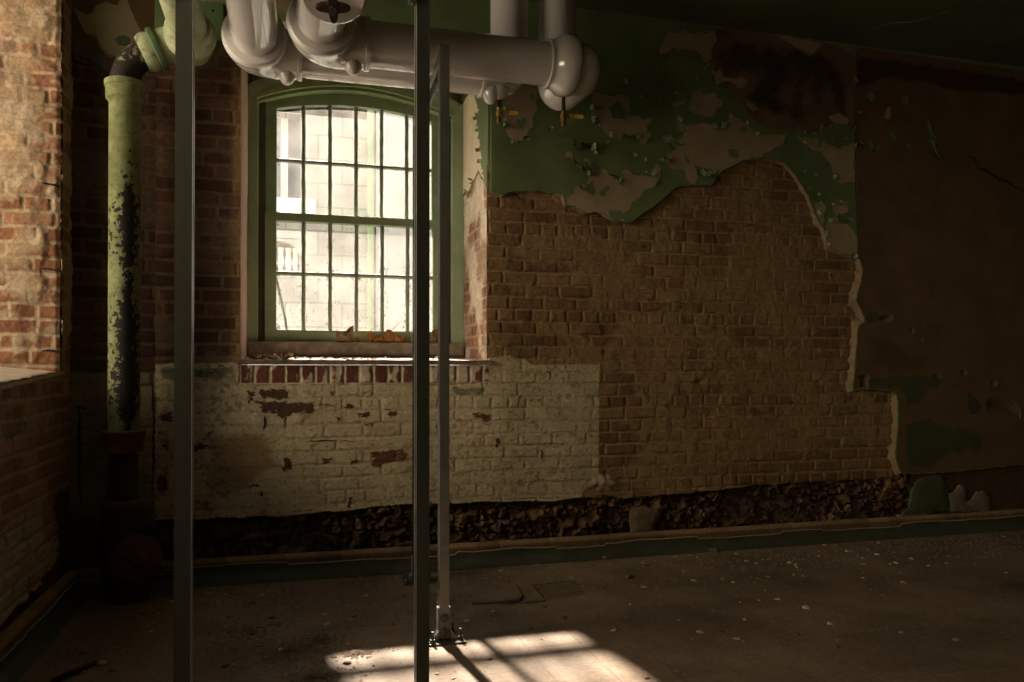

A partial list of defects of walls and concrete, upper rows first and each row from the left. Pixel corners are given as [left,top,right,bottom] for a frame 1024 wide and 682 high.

flaking render [429,78,1024,557]
peeling [246,387,373,427]
peeling [369,448,408,468]
spalling [193,497,412,568]